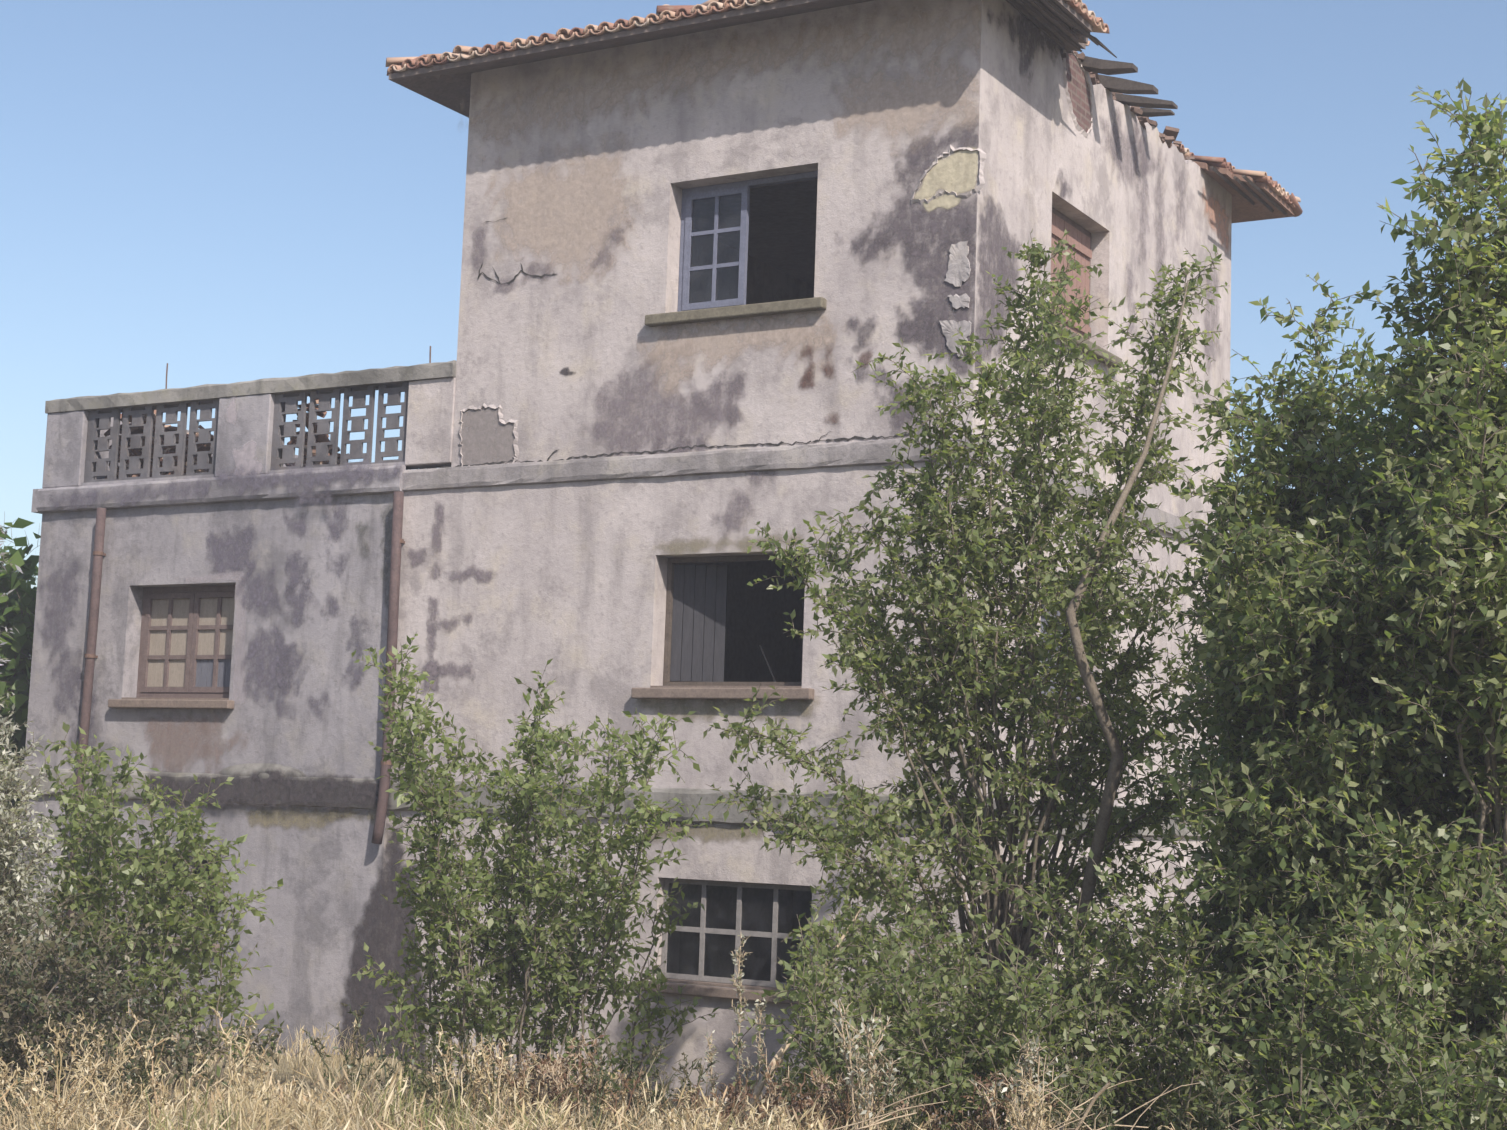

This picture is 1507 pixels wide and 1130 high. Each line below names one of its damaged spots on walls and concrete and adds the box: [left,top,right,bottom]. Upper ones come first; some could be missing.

leakage [472,6,1064,374]
peeling [911,144,986,211]
crack [478,262,557,284]
leakage [594,316,833,455]
leakage [50,441,492,607]
leakage [207,528,309,715]
leakage [422,598,471,694]
leakage [147,714,406,810]
leakage [338,828,428,1073]